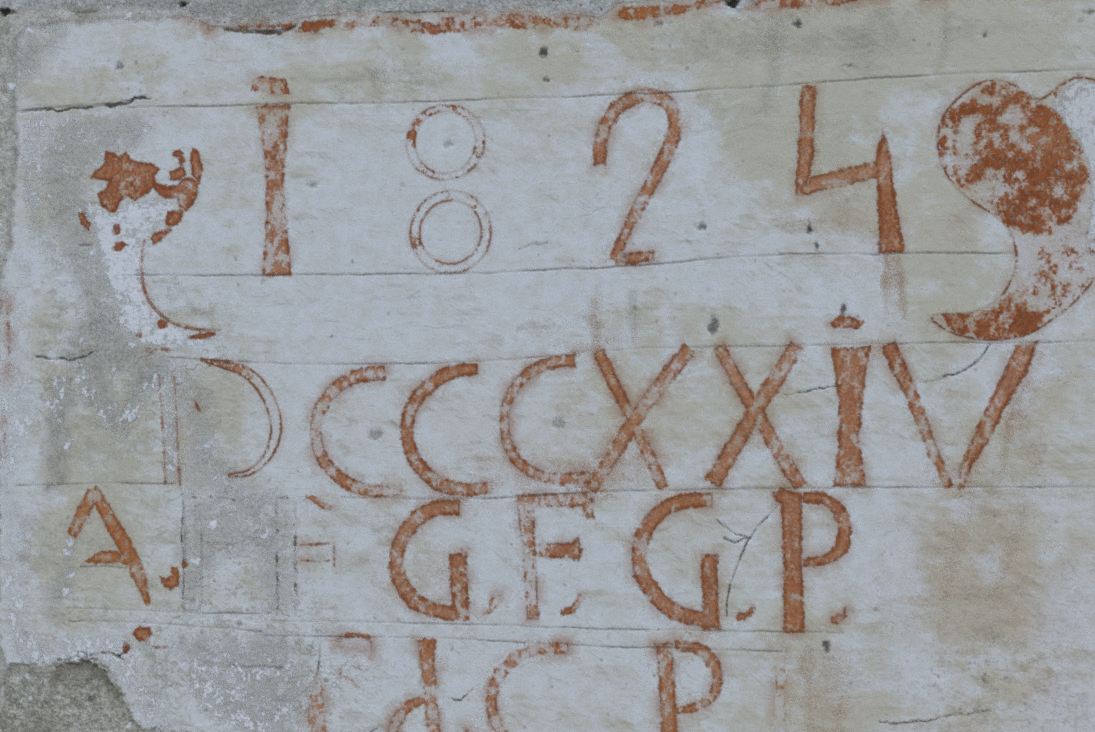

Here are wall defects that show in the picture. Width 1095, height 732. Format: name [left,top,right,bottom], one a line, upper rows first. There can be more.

crack [47,96,147,112]
spalling [0,3,180,313]
spalling [0,649,162,732]
peeling [191,647,309,732]